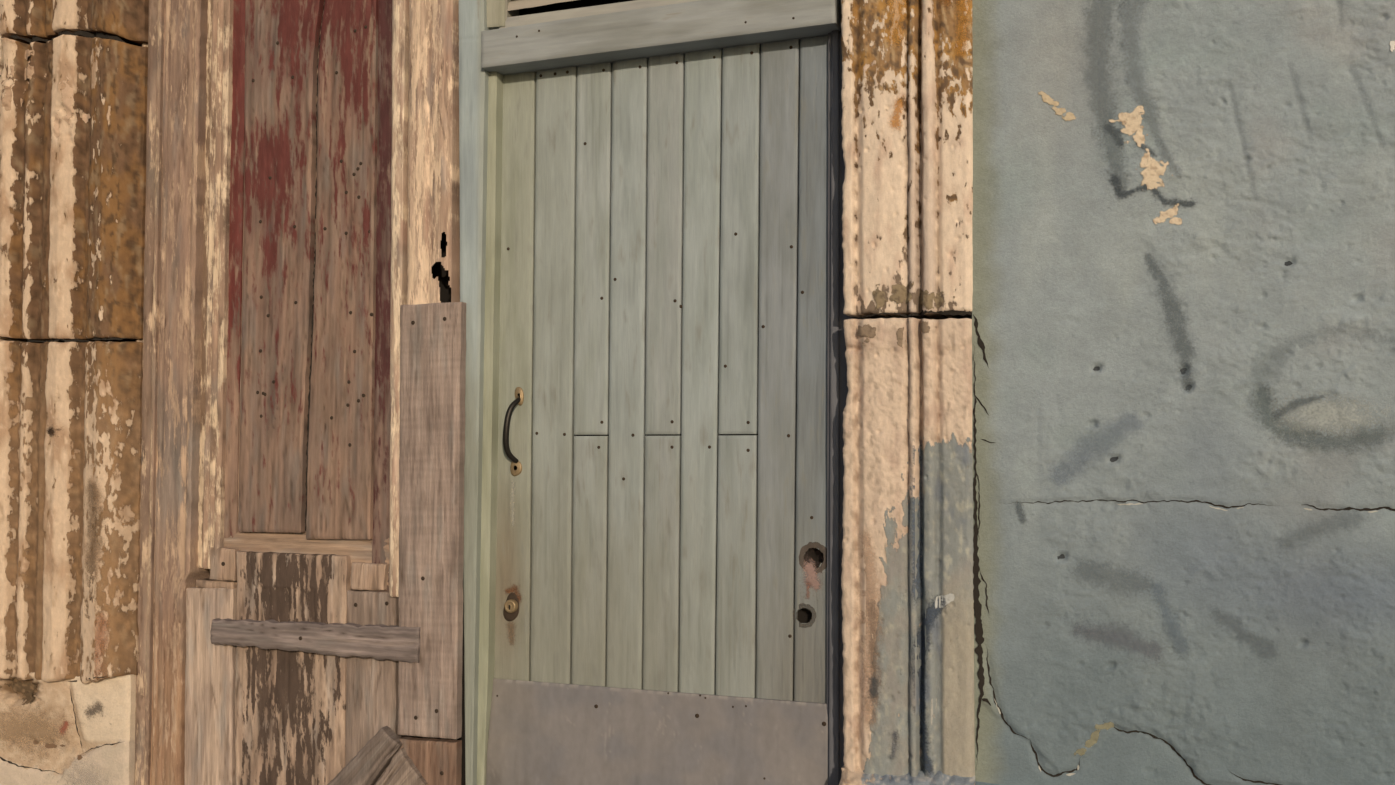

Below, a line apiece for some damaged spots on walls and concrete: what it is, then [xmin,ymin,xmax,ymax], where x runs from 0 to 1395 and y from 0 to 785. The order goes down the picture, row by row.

peeling [1038,91,1076,121]
peeling [1109,106,1173,190]
damp [1111,175,1195,207]
peeling [1153,204,1182,225]
crack [857,310,1395,785]
peeling [934,593,955,609]